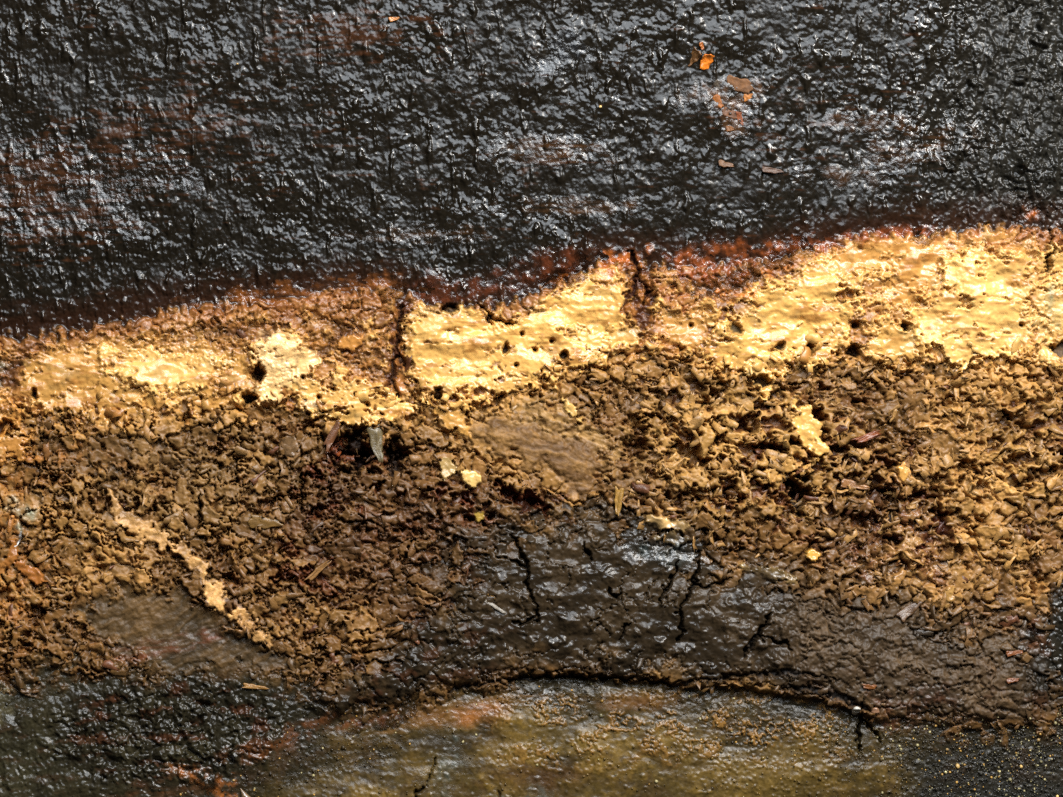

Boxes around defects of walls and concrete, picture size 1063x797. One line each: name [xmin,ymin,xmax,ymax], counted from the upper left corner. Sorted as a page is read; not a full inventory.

peeling [688,42,715,70]
peeling [712,75,753,132]
rust [132,203,1063,339]
crack [625,249,656,305]
crack [582,541,593,562]
crack [508,534,541,627]
crack [607,587,632,637]
crack [658,550,734,642]